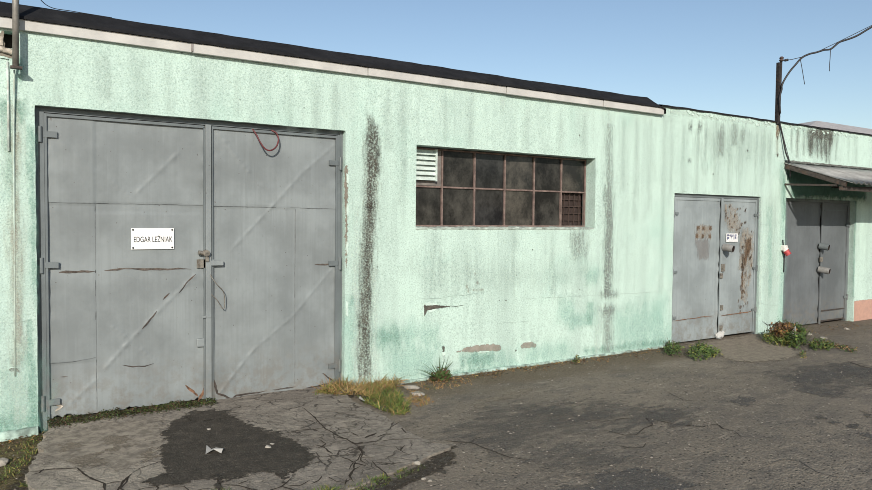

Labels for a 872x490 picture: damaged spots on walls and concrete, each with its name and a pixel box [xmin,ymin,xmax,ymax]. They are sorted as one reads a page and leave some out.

leakage [791,130,833,160]
leakage [358,125,379,376]
rust [725,205,754,312]
peeling [422,302,462,316]
spalling [457,343,501,353]
crack [32,407,422,490]